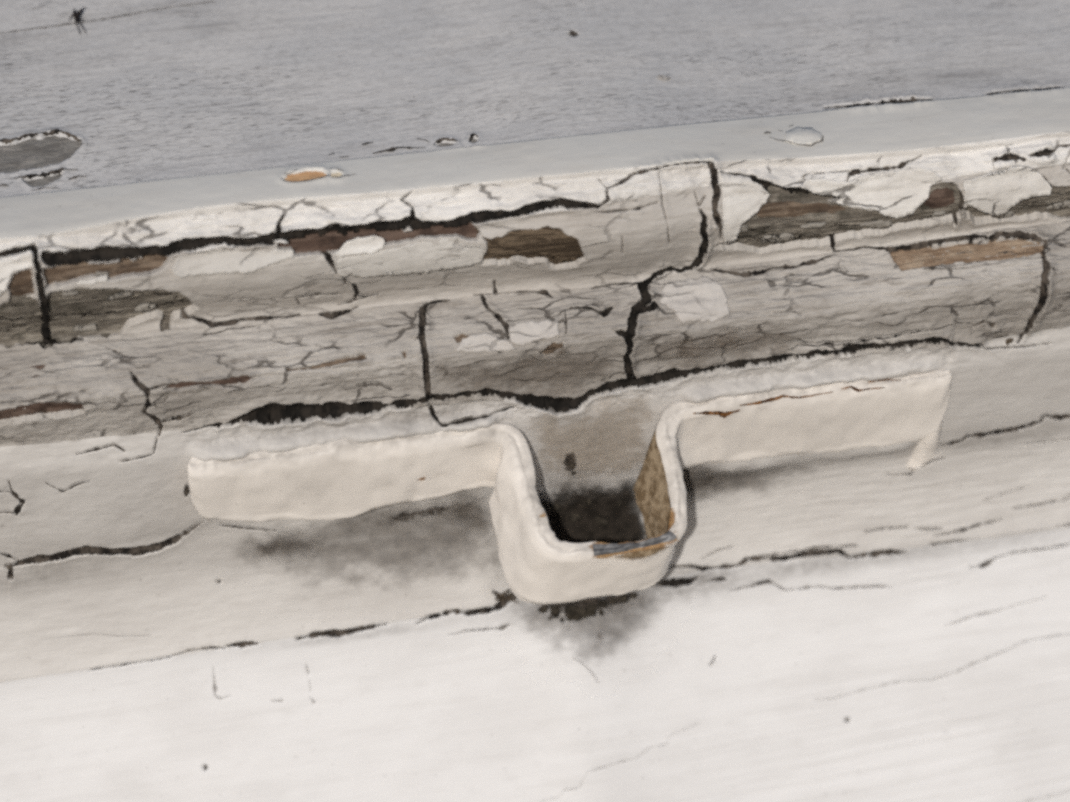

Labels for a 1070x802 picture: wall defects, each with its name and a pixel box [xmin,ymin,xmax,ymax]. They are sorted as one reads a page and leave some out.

peeling [0,129,87,190]
crack [993,144,1070,186]
peeling [721,165,1070,248]
peeling [890,237,1044,271]
peeling [0,223,584,348]
crack [0,155,1051,462]
crack [0,481,25,516]
crack [1,522,276,579]
crack [657,487,1070,591]
crack [43,634,258,671]
crack [297,623,387,640]
crack [417,593,517,635]